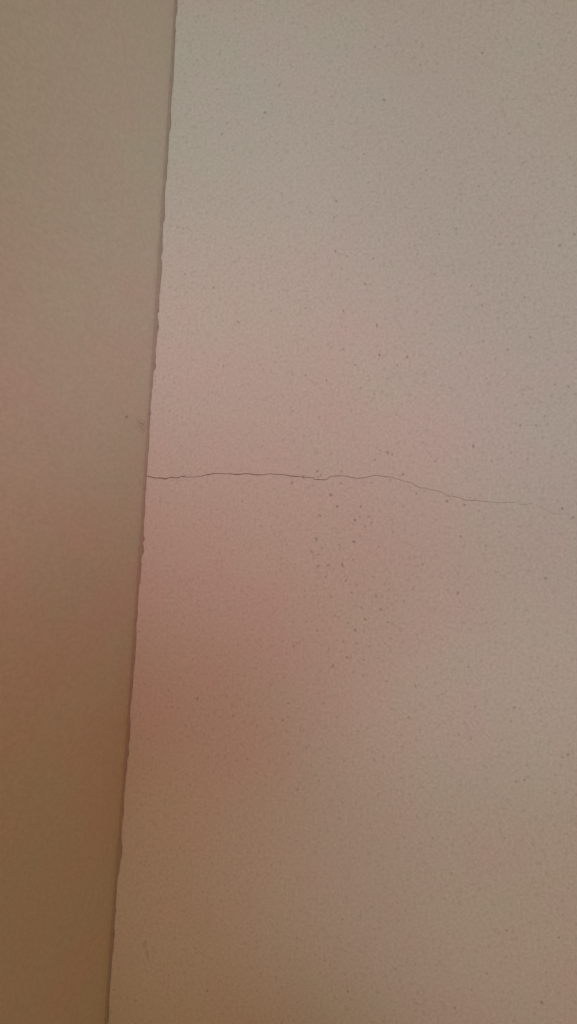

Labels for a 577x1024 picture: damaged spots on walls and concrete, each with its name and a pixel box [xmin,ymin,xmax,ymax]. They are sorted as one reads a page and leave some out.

crack [105,0,555,1024]